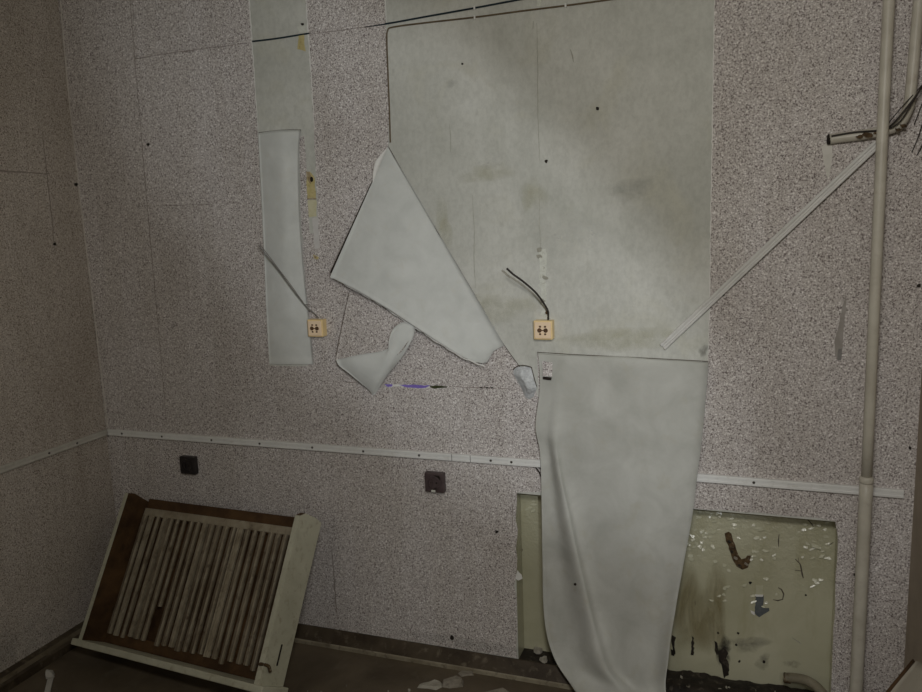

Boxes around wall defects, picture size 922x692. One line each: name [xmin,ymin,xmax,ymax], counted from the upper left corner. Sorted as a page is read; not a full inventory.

peeling [248,0,320,364]
peeling [330,0,715,395]
peeling [834,295,847,360]
corrosion [725,532,751,570]
leakage [714,641,729,678]